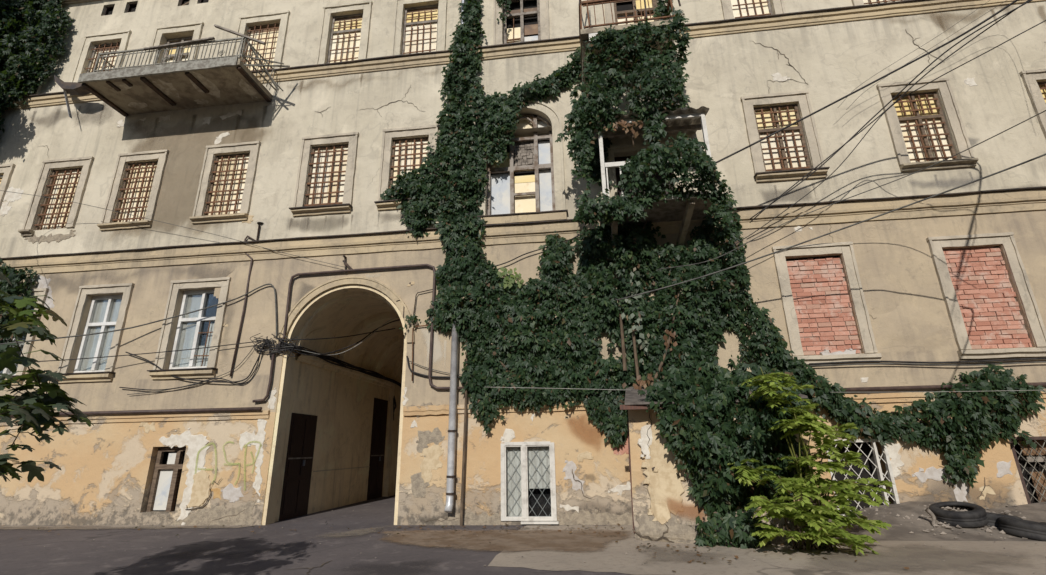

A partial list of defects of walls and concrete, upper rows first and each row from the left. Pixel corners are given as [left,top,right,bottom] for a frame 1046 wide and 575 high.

crack [753,41,807,91]
peeling [139,388,277,525]
peeling [402,387,445,498]
peeling [557,424,718,545]
flaking render [883,439,1013,502]